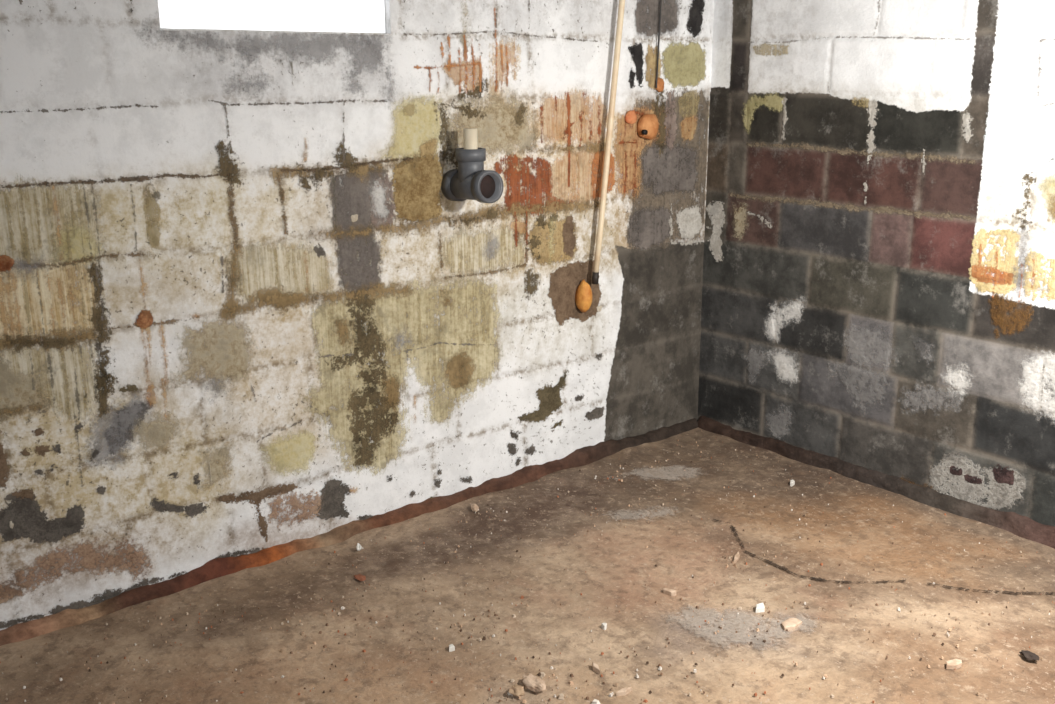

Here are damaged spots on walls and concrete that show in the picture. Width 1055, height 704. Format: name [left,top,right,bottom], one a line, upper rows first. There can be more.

leakage [144,27,217,50]
corrosion [414,8,521,95]
corrosion [0,255,20,277]
leakage [225,33,578,475]
peeling [524,259,602,326]
corrosion [968,229,1055,338]
leakage [173,314,255,392]
peeling [507,369,569,466]
leakage [201,447,230,487]
spalling [0,428,188,629]
peeling [149,479,373,559]
crack [713,519,1055,594]